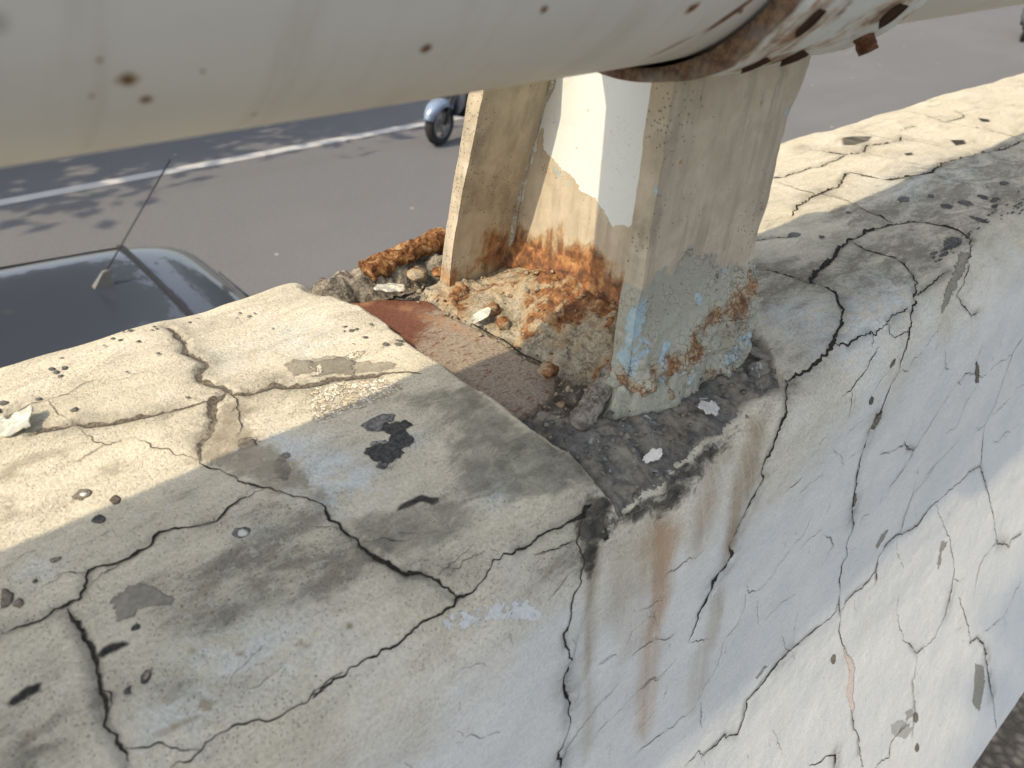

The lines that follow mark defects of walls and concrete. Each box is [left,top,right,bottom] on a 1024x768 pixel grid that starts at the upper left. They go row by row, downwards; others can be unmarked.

corrosion [119,75,136,84]
corrosion [709,0,752,30]
crack [3,324,703,768]
spalling [309,251,780,528]
corrosion [419,267,715,432]
water stain [576,446,724,579]
crack [599,114,1024,766]